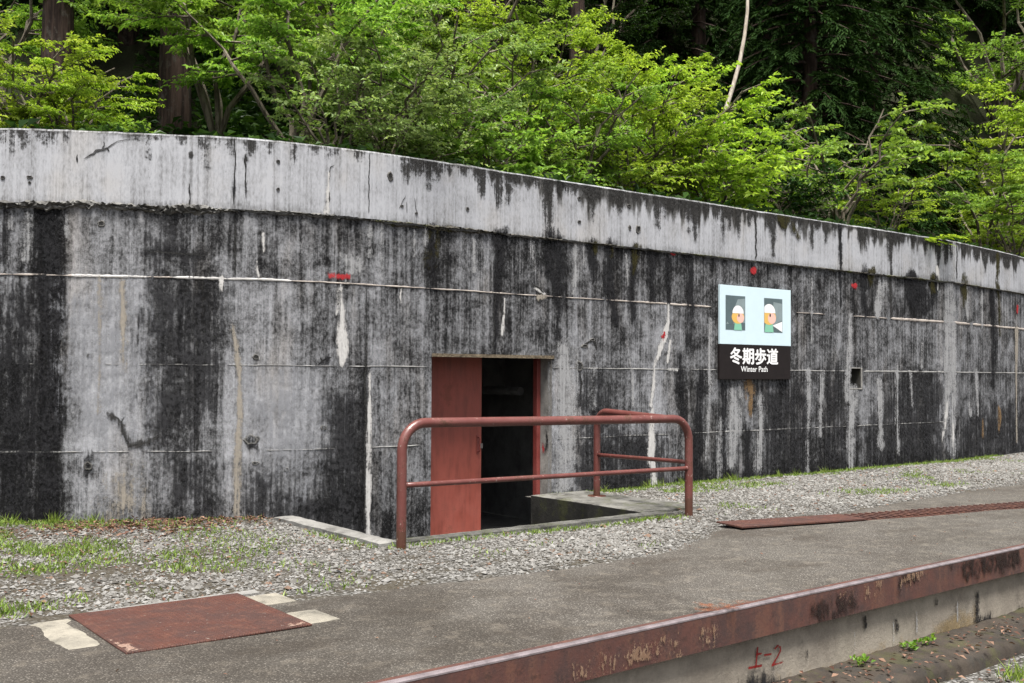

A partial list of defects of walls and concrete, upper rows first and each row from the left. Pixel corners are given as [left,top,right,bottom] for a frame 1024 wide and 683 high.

crack [76,139,127,162]
leakage [0,157,1024,535]
crack [107,412,161,448]